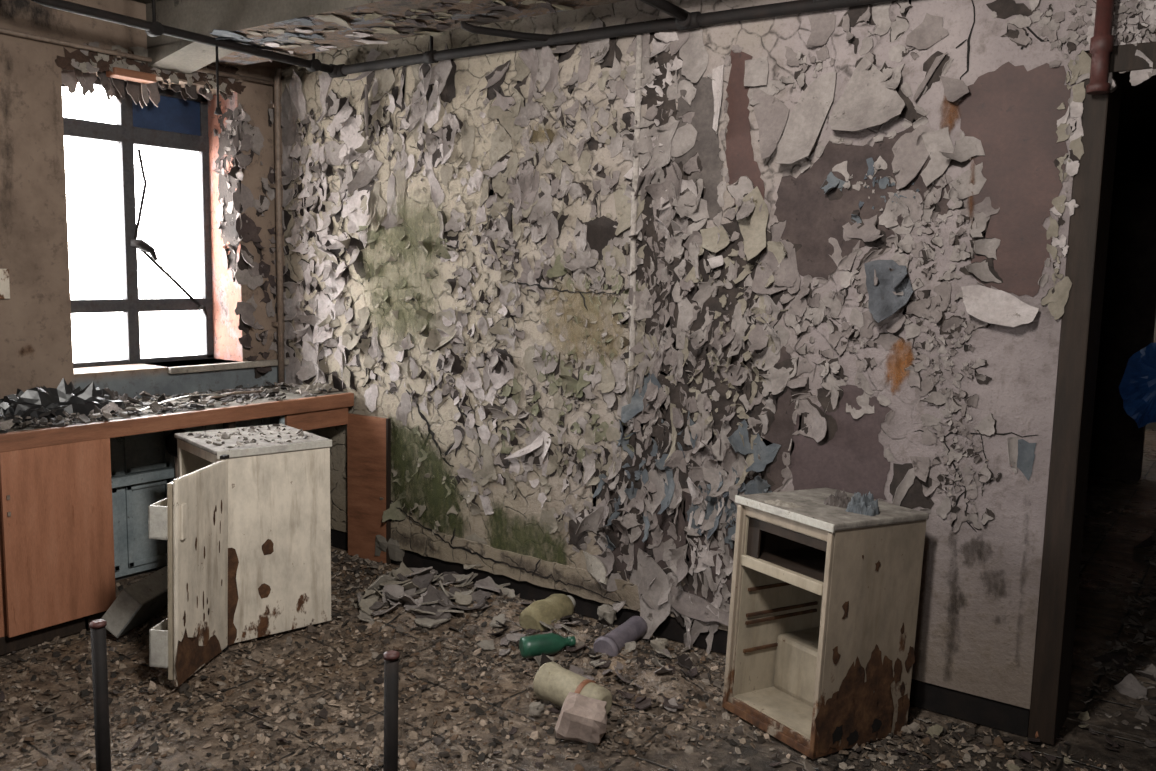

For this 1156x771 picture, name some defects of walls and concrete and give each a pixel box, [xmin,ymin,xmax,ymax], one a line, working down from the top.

peeling [1108,0,1156,93]
leakage [367,206,438,330]
spalling [55,0,1096,654]
leakage [391,418,464,538]